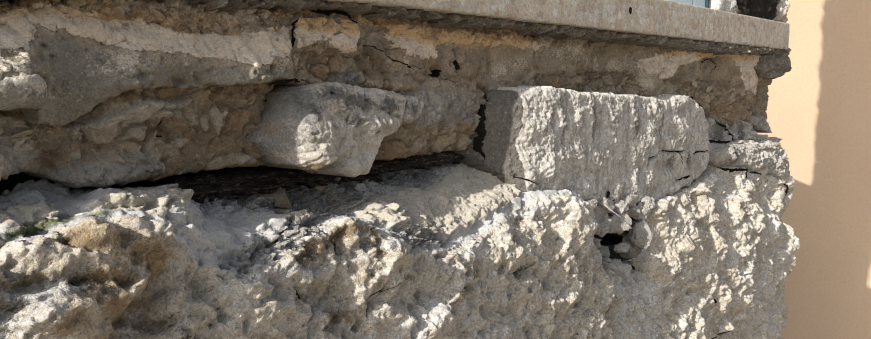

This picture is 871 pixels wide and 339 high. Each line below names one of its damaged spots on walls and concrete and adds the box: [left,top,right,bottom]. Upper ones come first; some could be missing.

crack [291,10,357,52]
crack [362,45,421,70]
crack [648,58,761,180]
spalling [593,190,640,284]
water stain [71,270,134,294]